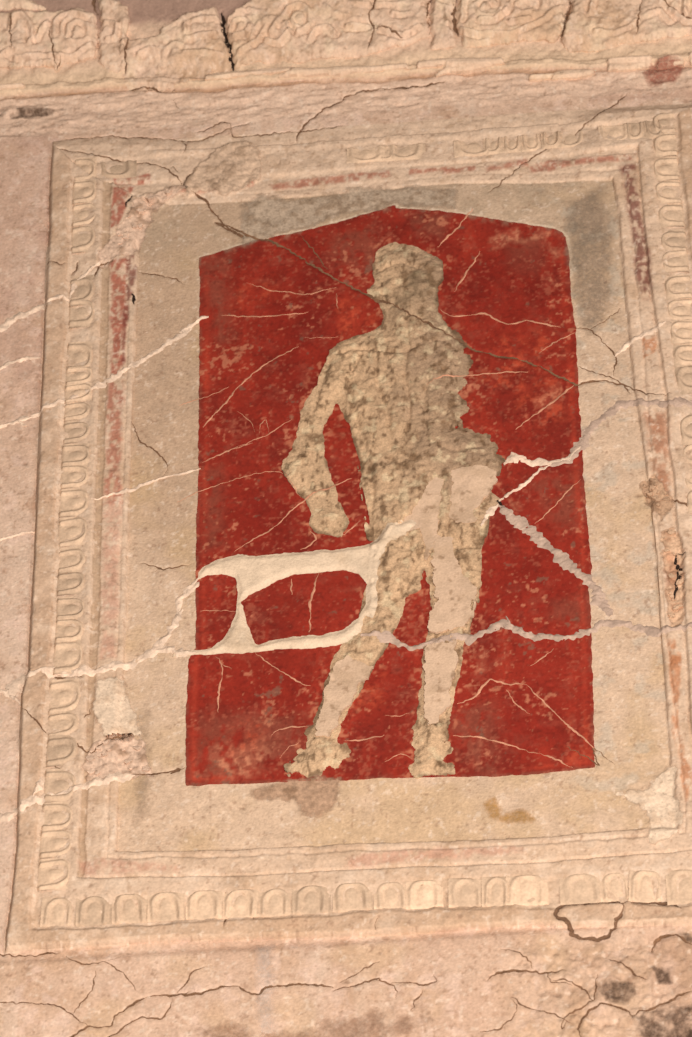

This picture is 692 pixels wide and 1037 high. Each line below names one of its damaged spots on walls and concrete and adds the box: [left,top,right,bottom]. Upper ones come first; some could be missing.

flaking render [96,141,261,268]
crack [0,81,692,768]
flaking render [640,475,674,516]
flaking render [660,527,685,627]
crack [0,736,184,822]
crack [0,952,437,1037]
crack [482,901,692,1037]
leakage [654,968,671,983]
leakage [641,1008,692,1037]